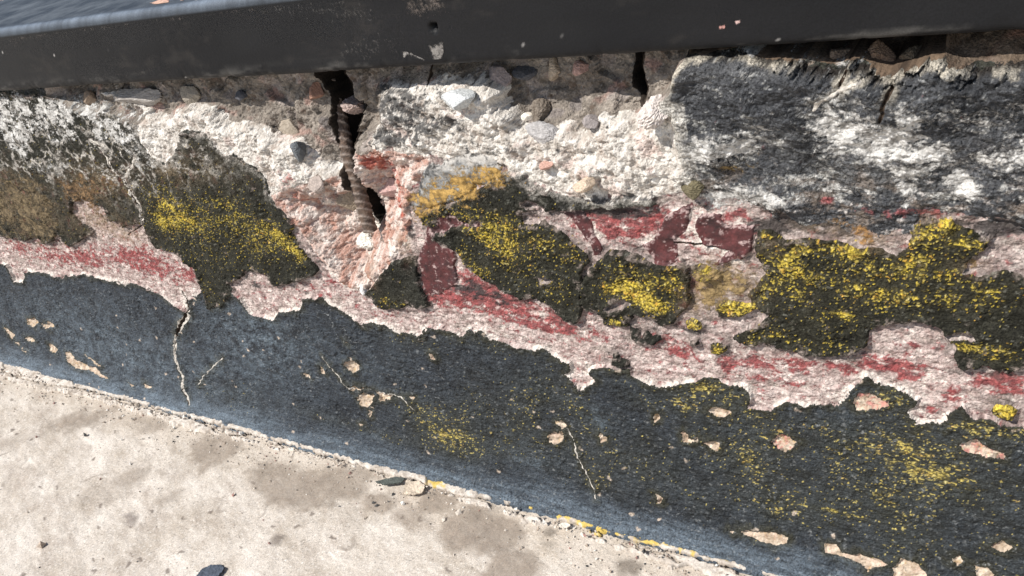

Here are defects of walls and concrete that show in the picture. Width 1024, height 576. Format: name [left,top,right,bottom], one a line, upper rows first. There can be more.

crack [812,38,895,124]
peeling [0,29,1024,428]
crack [74,291,287,449]